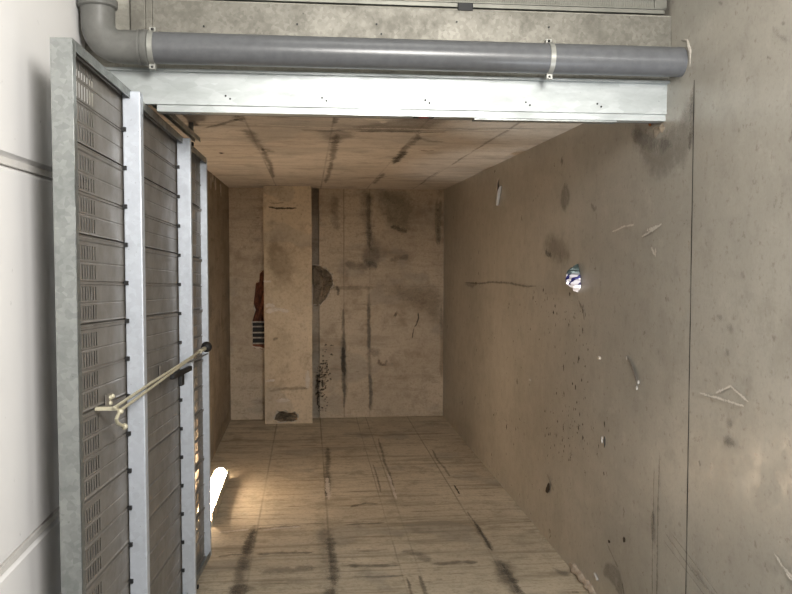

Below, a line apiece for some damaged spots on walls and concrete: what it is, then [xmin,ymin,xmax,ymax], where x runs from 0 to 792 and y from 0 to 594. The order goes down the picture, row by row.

leakage [315,344,346,411]